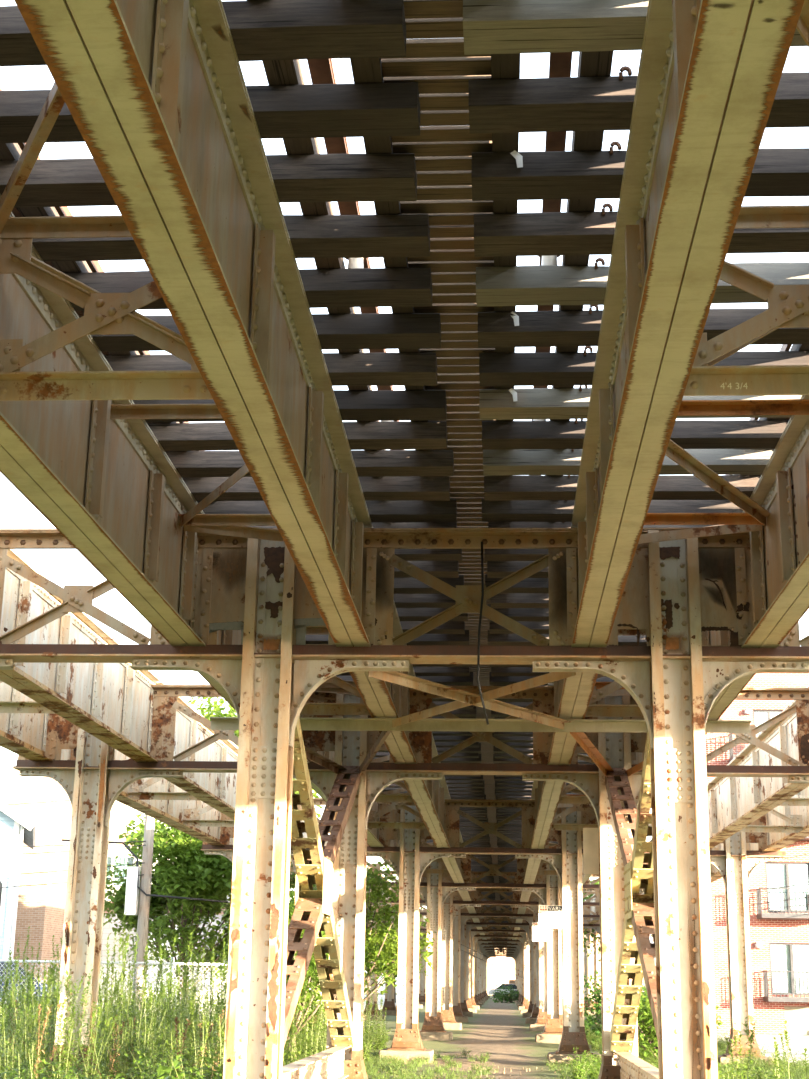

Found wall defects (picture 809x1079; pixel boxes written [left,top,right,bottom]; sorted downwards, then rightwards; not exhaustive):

rust [0,0,369,643]
rust [572,0,710,644]
rust [605,0,809,644]
peeling [264,547,285,583]
peeling [659,547,680,560]
peeling [265,587,293,618]
peeling [661,599,680,629]
rust [234,859,256,928]
rust [273,843,283,902]
peeling [225,925,240,1046]
rust [225,1015,236,1079]
rust [265,1027,274,1079]